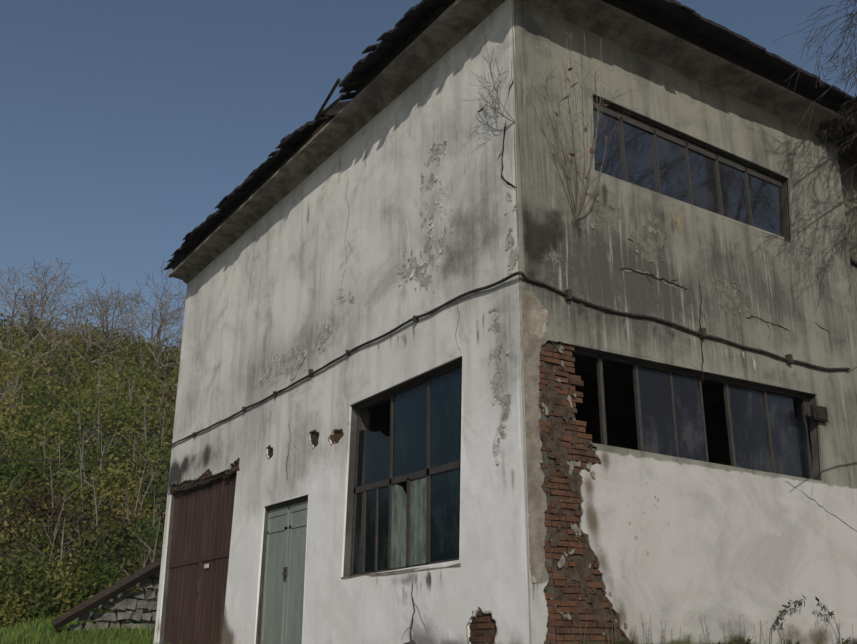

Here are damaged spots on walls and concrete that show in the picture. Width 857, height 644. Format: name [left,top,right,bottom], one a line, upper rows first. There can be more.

peeling [397,139,456,293]
leakage [523,210,562,260]
crack [620,268,707,384]
peeling [488,307,511,464]
spalling [308,429,344,449]
flaking render [521,290,630,644]
crack [785,481,856,531]
crack [403,581,427,644]
flaking render [466,605,499,644]